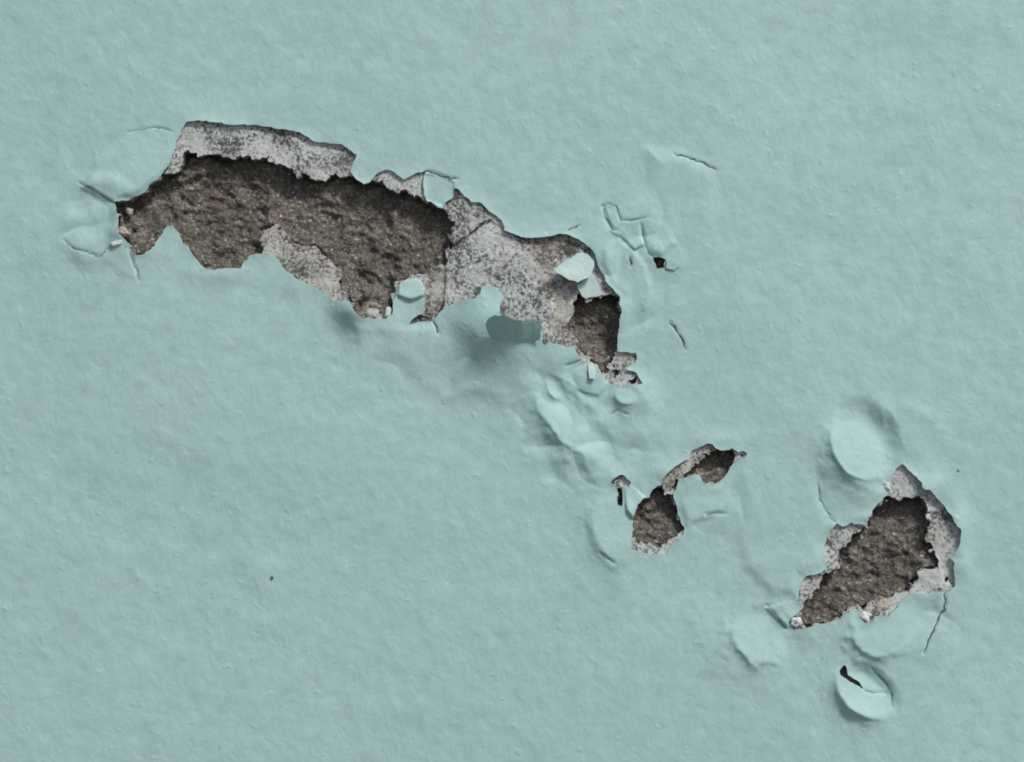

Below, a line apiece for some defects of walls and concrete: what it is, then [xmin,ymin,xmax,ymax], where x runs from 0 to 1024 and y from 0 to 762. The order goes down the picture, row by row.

spalling [82,121,717,396]
spalling [611,443,961,629]
crack [925,592,946,650]